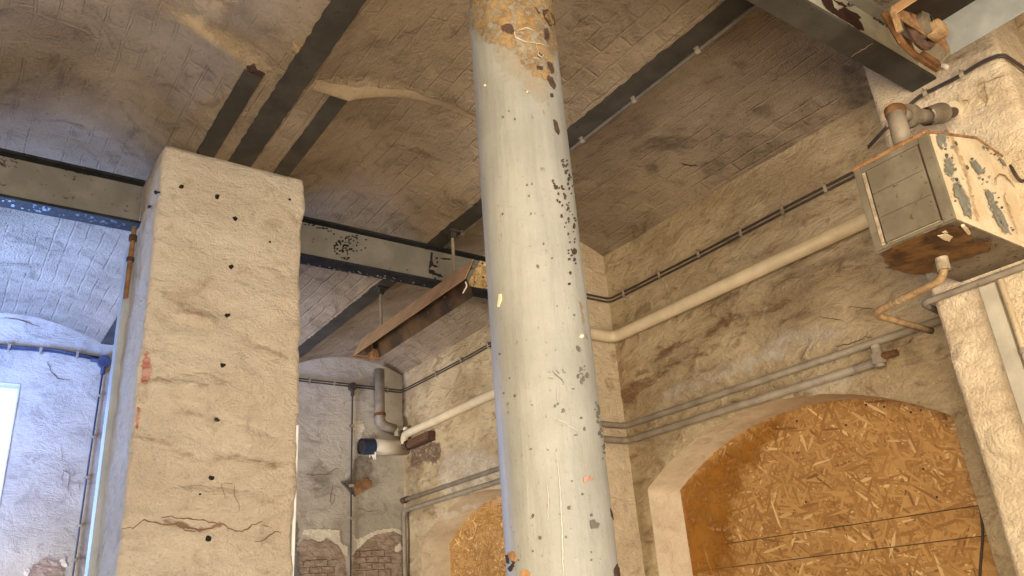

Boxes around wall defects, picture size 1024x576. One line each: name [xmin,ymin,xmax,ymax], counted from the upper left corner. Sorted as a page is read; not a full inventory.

corrosion [469,0,557,91]
peeling [552,159,577,285]
peeling [304,223,451,286]
crack [122,483,281,542]
flaking render [298,528,403,576]